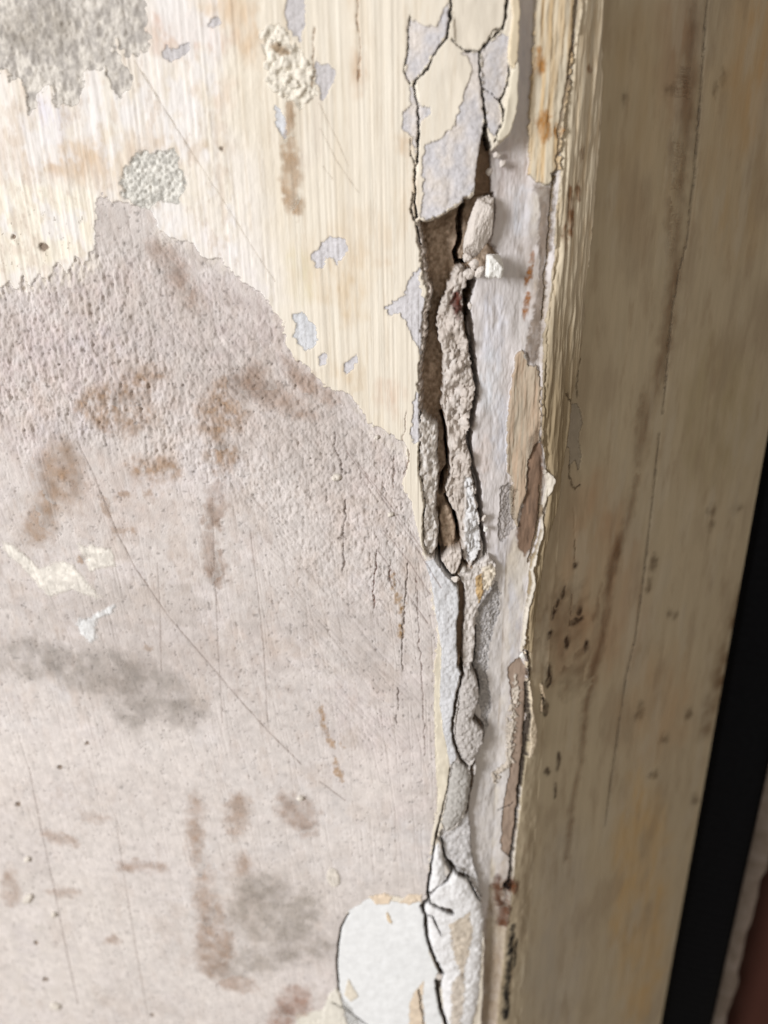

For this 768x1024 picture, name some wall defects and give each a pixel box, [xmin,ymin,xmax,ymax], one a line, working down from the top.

crack [405,0,509,244]
flaking render [0,0,604,1024]
crack [418,572,484,1024]